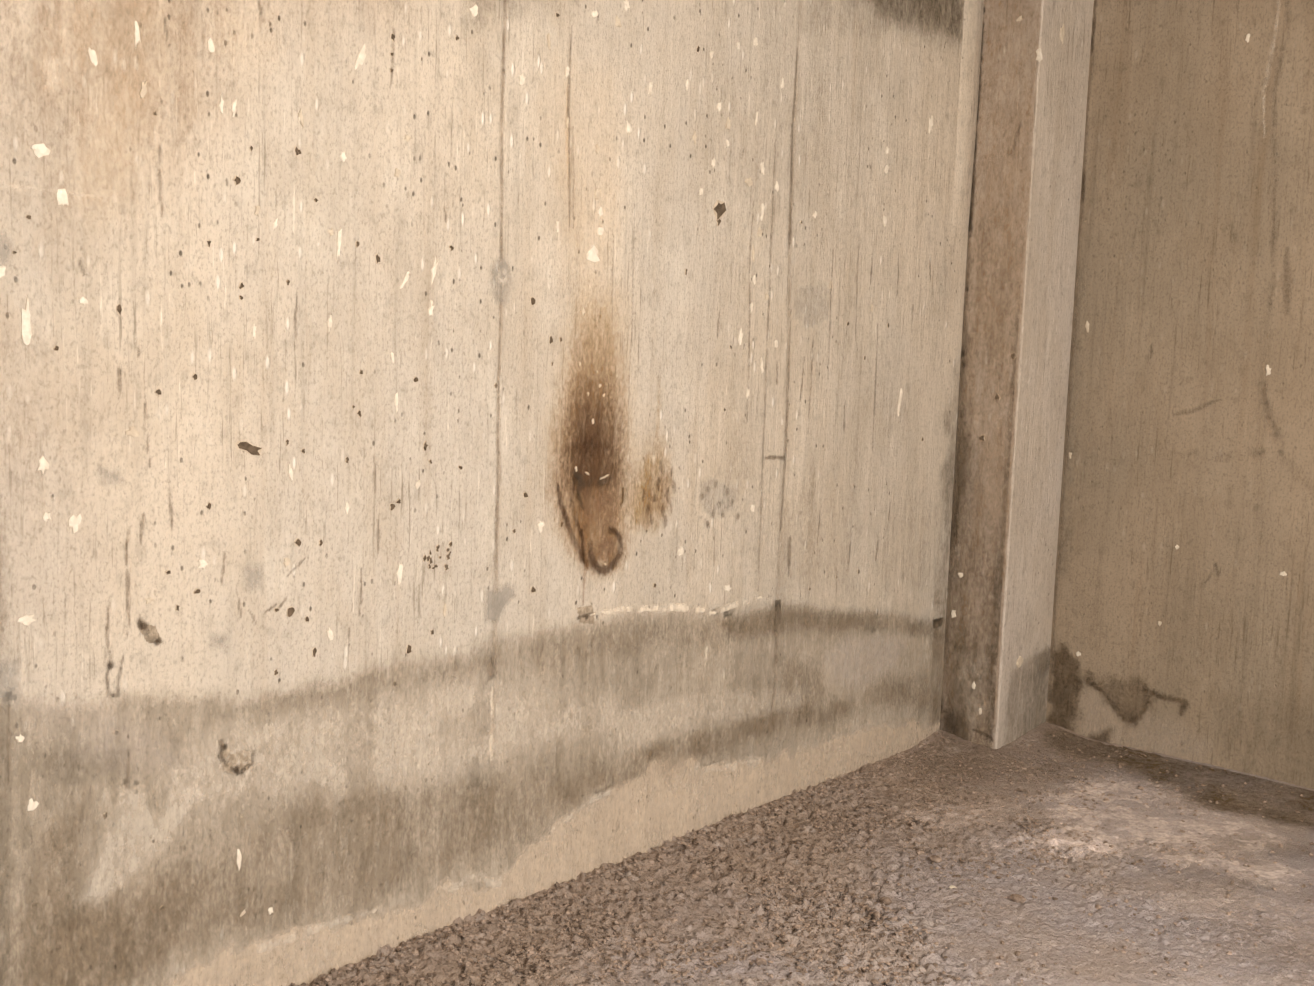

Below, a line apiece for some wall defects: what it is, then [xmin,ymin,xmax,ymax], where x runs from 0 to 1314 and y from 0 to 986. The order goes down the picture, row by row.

leakage [0,0,1038,986]
corrosion [557,352,622,574]
corrosion [635,457,667,521]
leakage [1017,648,1314,879]